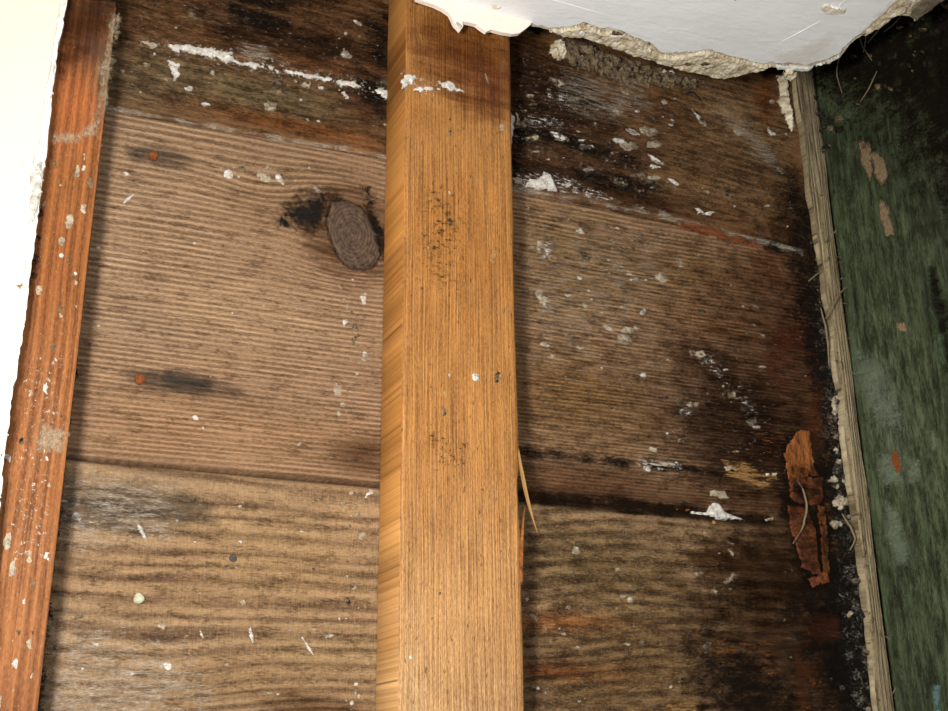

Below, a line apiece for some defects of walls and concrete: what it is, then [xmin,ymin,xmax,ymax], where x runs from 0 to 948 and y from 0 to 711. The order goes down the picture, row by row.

damp [366,15,388,68]
flaking render [549,23,841,82]
damp [169,44,387,120]
damp [401,73,464,92]
mould [818,11,948,182]
damp [511,115,658,192]
damp [278,193,337,231]
damp [360,186,384,241]
damp [520,447,735,477]
damp [776,174,873,711]
damp [518,492,708,519]